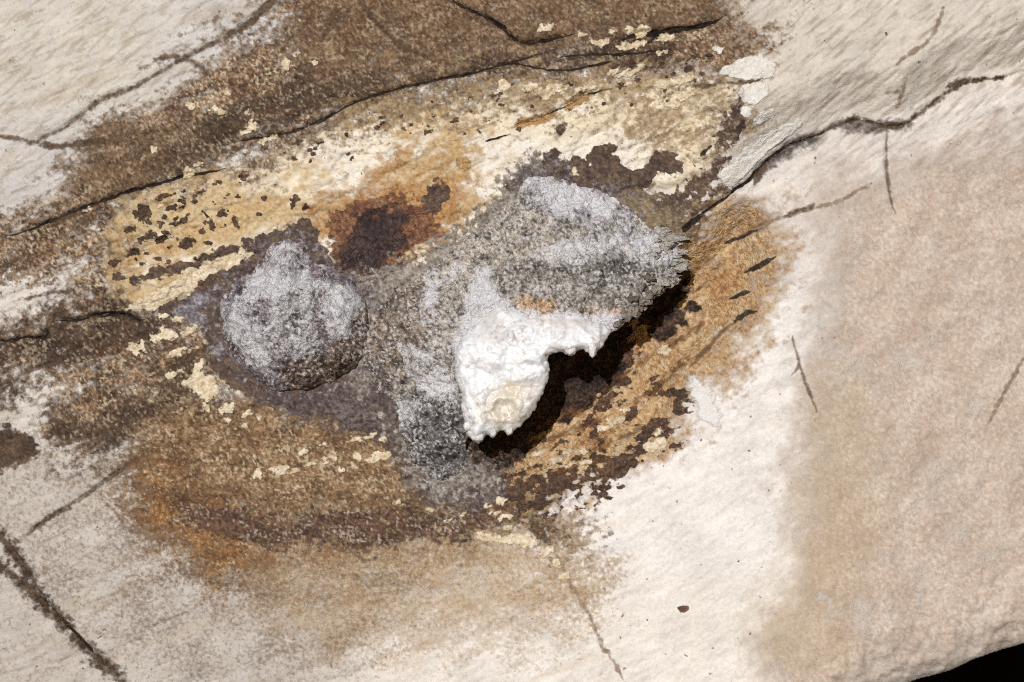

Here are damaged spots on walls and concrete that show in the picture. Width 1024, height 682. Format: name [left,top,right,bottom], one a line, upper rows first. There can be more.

crack [0,457,136,682]
peeling [240,109,278,146]
rust [105,113,491,301]
rust [107,455,593,649]
crack [0,0,722,269]
damp [0,0,789,590]
peeling [531,448,592,469]
rust [467,197,801,534]
peeling [643,428,667,453]
spalling [694,309,757,363]
crack [792,338,814,403]
crack [682,7,1005,236]